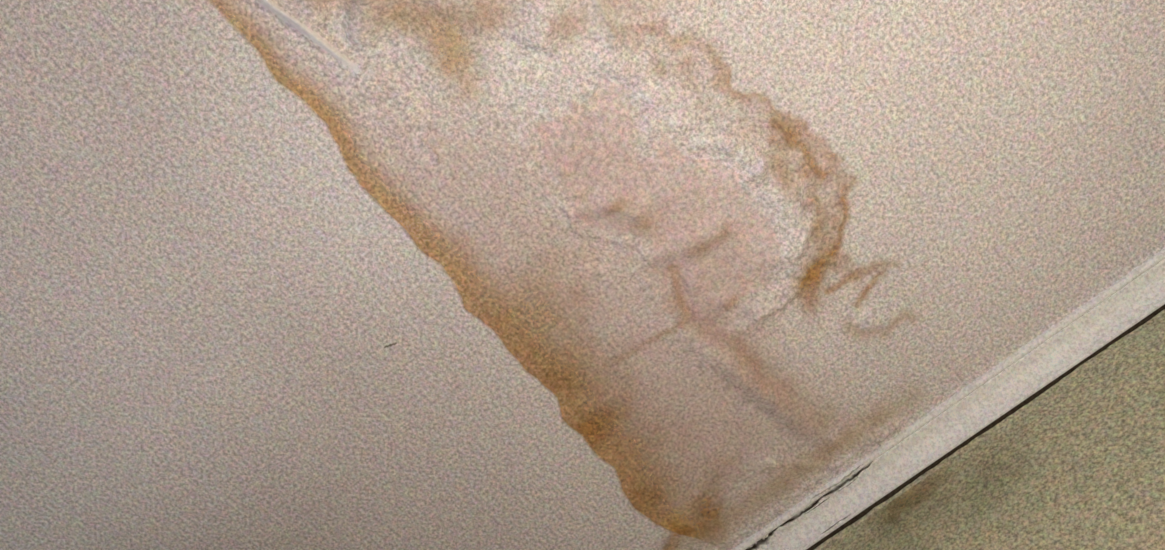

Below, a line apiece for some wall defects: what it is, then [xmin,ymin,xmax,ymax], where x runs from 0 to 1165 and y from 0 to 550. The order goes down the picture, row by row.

peeling [281,45,464,217]
leakage [244,30,718,537]
leakage [801,258,825,290]